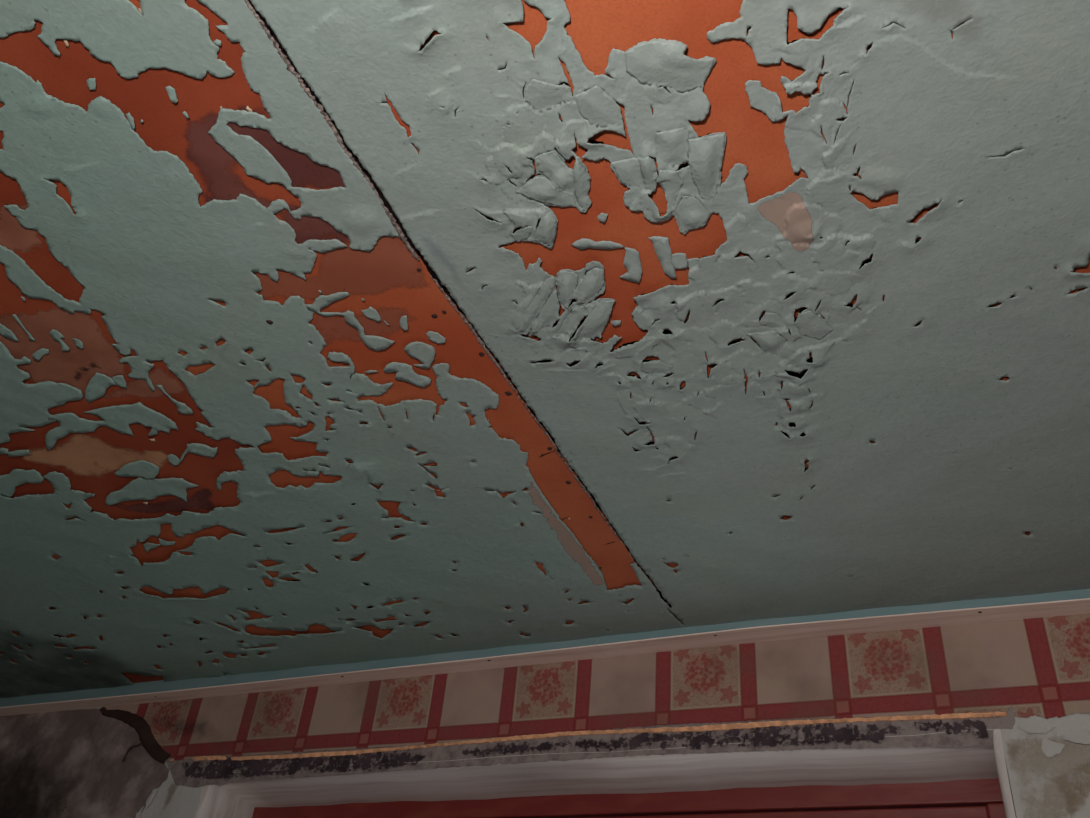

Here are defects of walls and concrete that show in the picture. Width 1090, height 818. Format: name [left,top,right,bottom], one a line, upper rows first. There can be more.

peeling [786,6,849,43]
peeling [0,0,271,209]
peeling [383,95,419,154]
peeling [48,180,76,215]
peeling [227,162,334,221]
peeling [499,0,833,354]
peeling [849,167,898,209]
crack [245,0,684,625]
peeling [628,356,686,388]
peeling [0,232,652,612]
leakage [1009,739,1090,818]